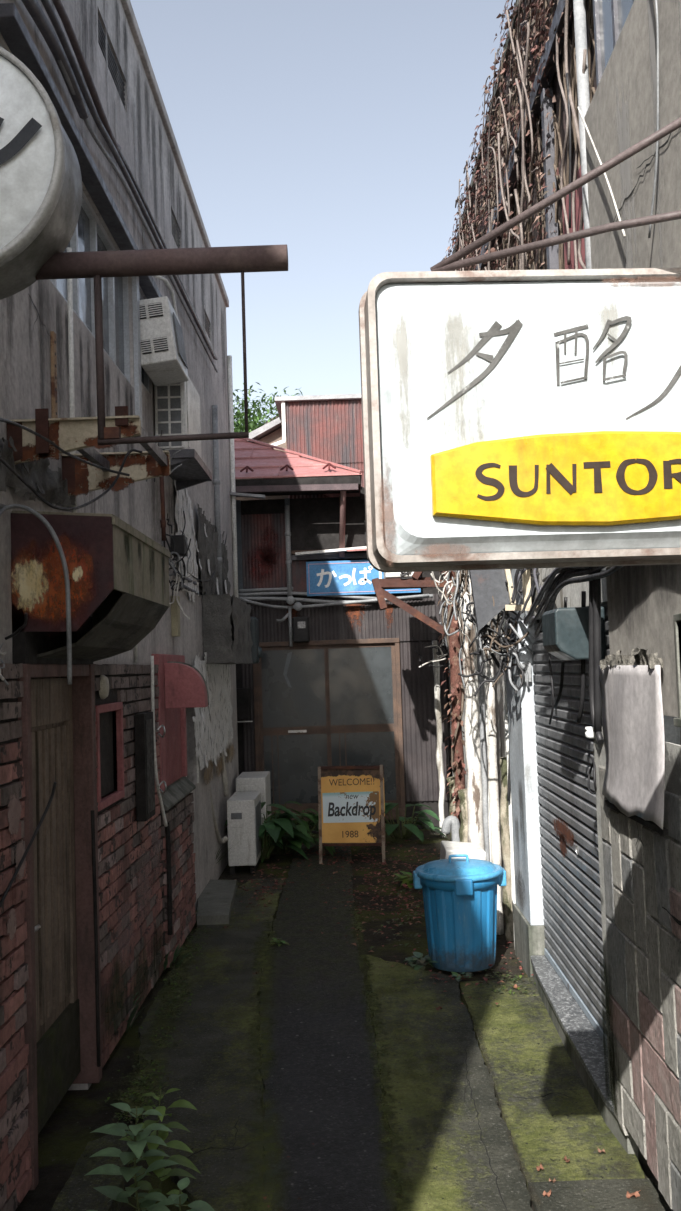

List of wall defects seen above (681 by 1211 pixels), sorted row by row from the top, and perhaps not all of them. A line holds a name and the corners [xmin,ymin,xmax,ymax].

corrosion [7,420,170,496]
corrosion [11,532,96,630]
peeling [192,652,233,770]
crack [464,1047,508,1211]